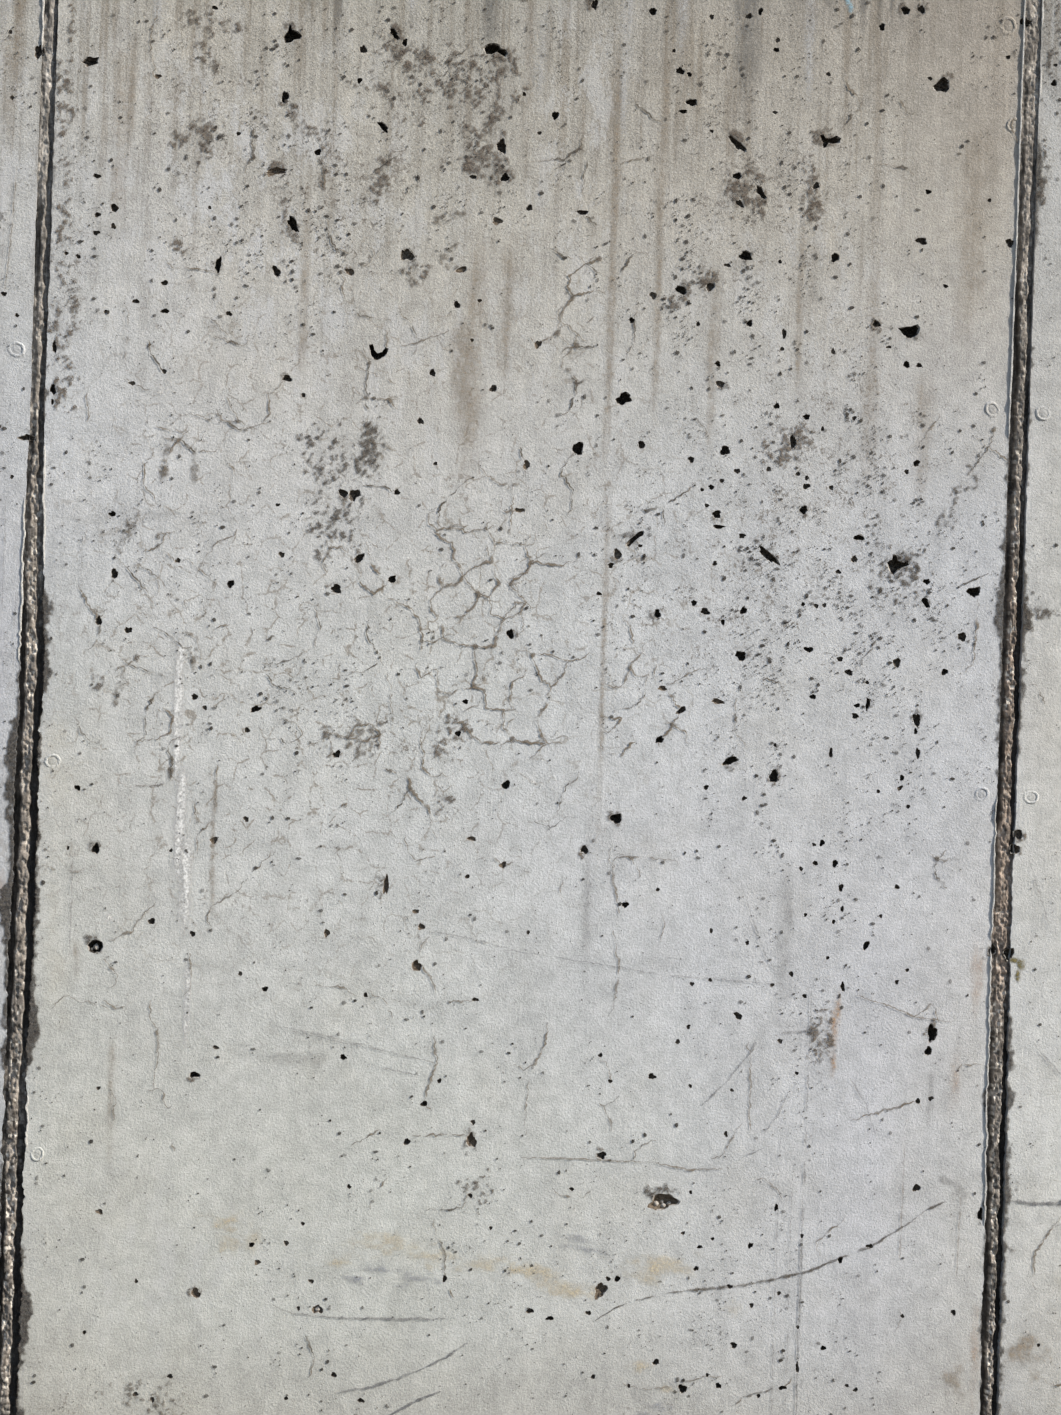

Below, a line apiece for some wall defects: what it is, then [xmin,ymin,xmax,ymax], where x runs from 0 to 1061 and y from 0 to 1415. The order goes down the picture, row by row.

crack [125,308,163,390]
crack [211,319,248,346]
crack [322,155,448,448]
crack [531,139,641,415]
crack [78,383,281,786]
crack [265,447,781,861]
crack [194,765,218,853]